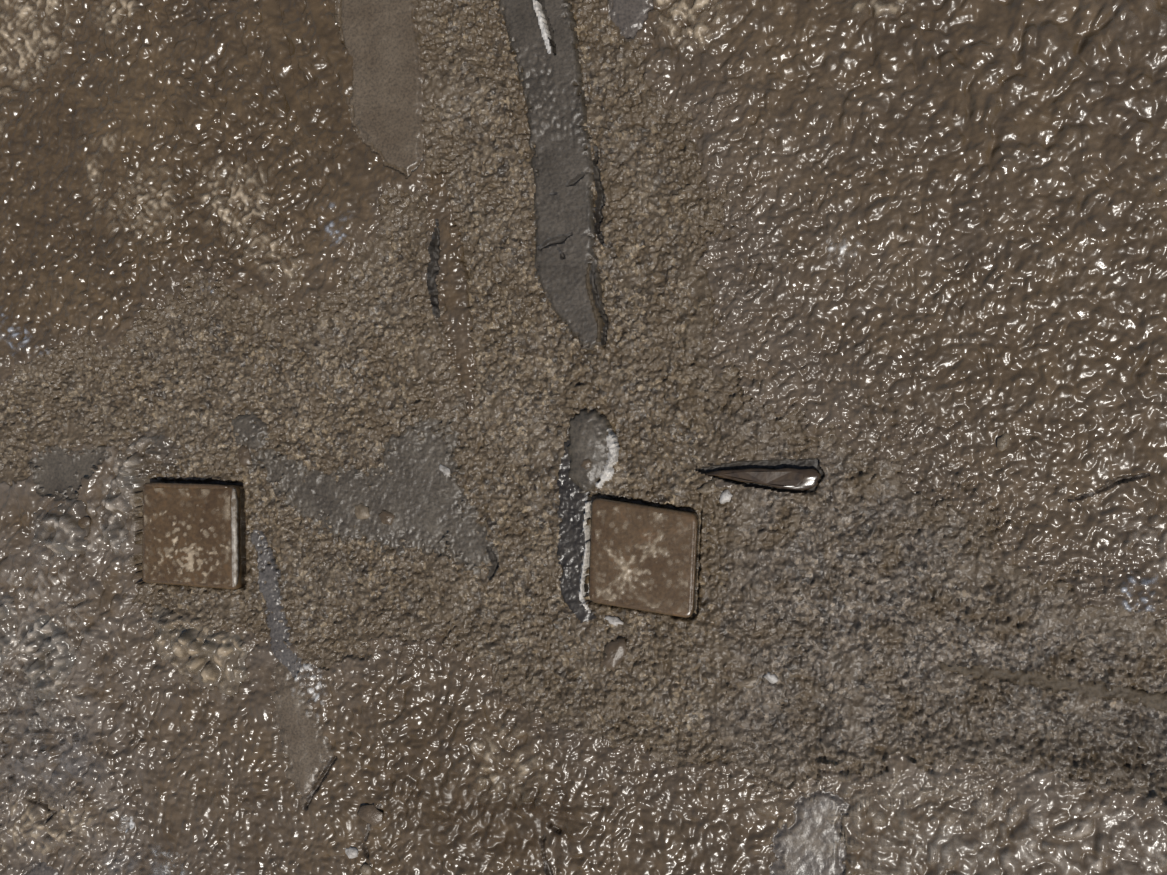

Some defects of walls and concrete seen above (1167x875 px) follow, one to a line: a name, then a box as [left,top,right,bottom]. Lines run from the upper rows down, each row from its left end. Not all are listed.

crack [533,0,556,56]
crack [537,146,609,345]
spalling [0,0,741,767]
spalling [701,384,1167,805]
peeling [770,788,850,875]